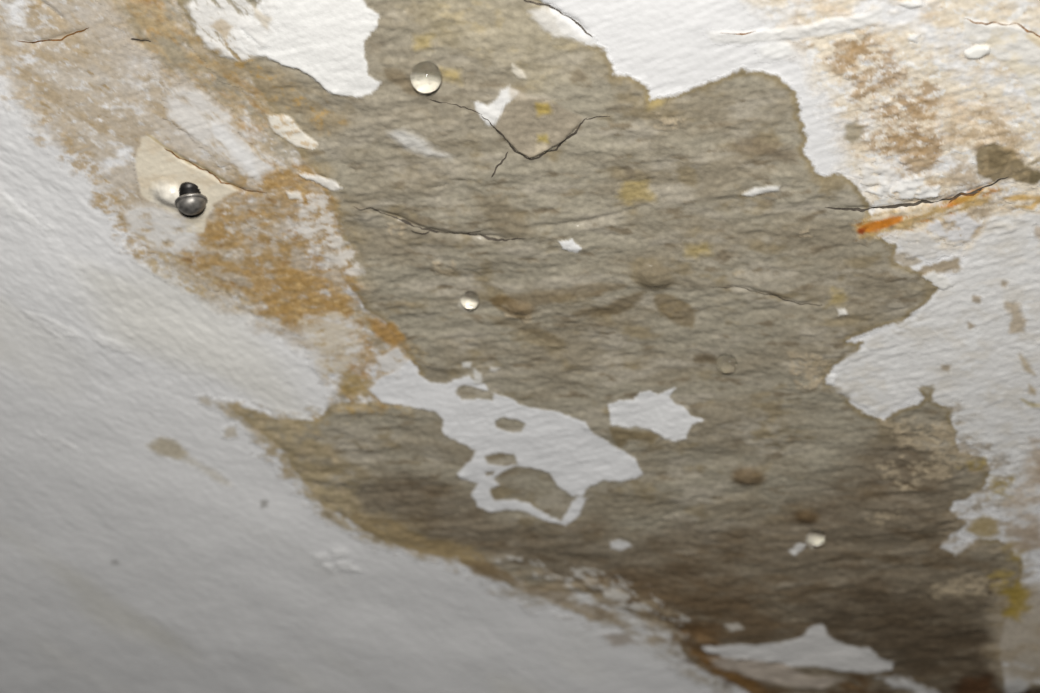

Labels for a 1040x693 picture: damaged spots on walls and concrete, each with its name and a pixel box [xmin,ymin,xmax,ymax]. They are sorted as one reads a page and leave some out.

peeling [181,0,384,100]
crack [524,0,592,37]
crack [964,18,1040,37]
damp [0,0,309,360]
crack [429,99,609,177]
damp [735,0,1040,210]
corrosion [847,180,1040,247]
peeling [823,208,1040,475]
peeling [294,308,707,527]
damp [194,394,398,557]
damp [344,509,500,575]
peeling [699,621,942,693]